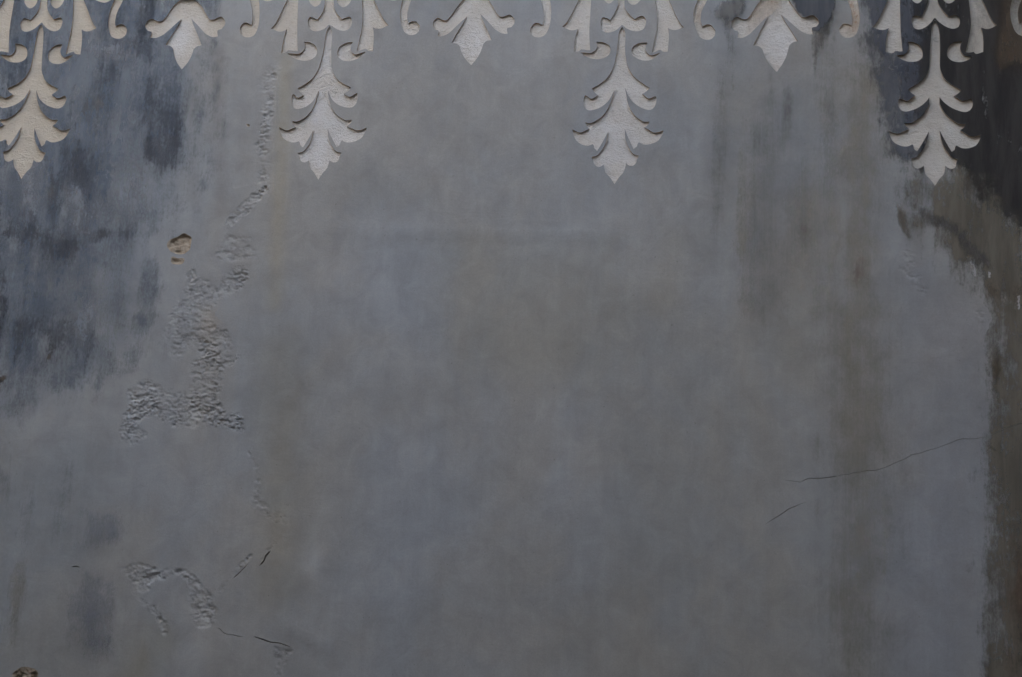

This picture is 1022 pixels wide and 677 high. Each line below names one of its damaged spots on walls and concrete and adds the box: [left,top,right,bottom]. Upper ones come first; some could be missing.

leakage [995,0,1022,69]
leakage [0,0,182,387]
spalling [117,233,252,448]
crack [766,423,1020,524]
leakage [898,165,1022,677]
spalling [119,553,253,638]